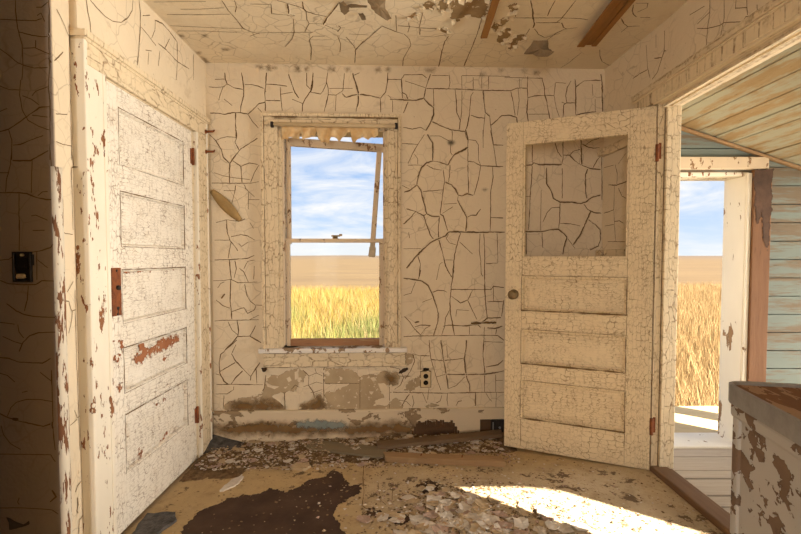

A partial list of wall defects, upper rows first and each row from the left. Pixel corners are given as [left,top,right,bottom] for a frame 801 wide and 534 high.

peeling [407,0,528,52]
crack [634,31,666,79]
crack [0,0,80,462]
crack [86,0,608,409]
crack [525,138,627,255]
peeling [132,334,179,364]
peeling [224,352,434,411]